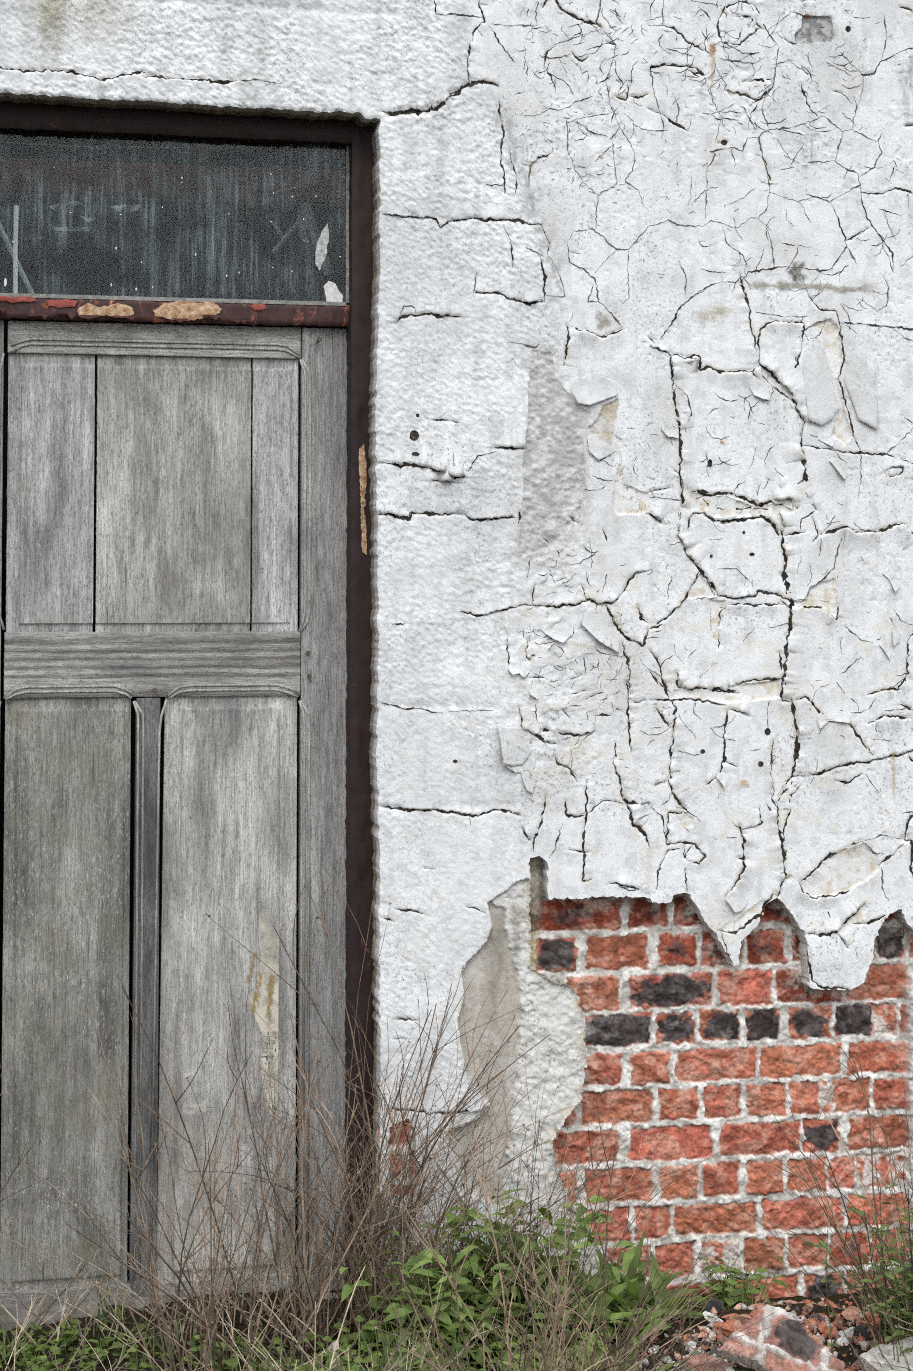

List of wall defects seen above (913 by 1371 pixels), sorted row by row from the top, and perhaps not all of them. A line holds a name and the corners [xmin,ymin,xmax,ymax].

crack [0,66,282,94]
crack [376,0,913,990]
spalling [378,856,913,1306]
peeling [800,842,880,898]